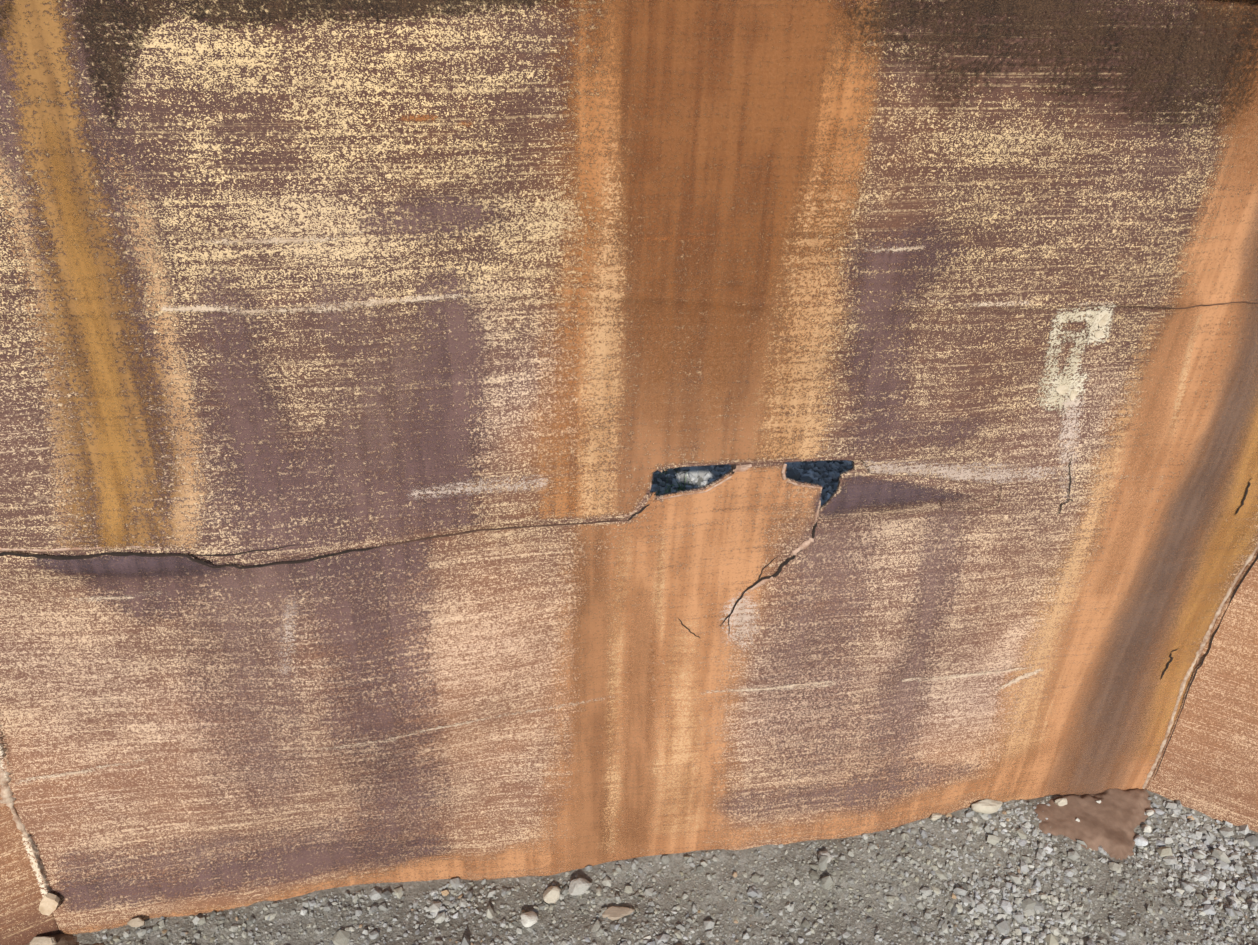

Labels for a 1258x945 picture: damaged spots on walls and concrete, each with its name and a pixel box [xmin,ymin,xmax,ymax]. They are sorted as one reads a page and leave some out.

corrosion [0,0,211,553]
damp [53,268,488,910]
crack [0,504,650,569]
crack [678,500,821,639]
corrosion [261,0,1258,901]
damp [720,504,972,833]
damp [842,219,985,454]
crack [1154,556,1258,778]
crack [1234,479,1251,516]